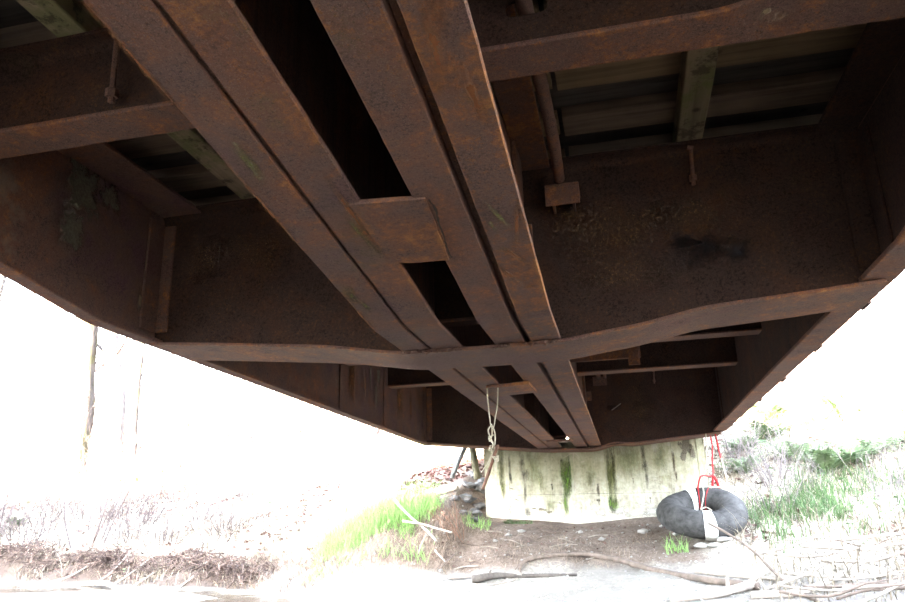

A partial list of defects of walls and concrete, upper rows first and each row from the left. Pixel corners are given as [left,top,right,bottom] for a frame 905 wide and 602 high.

corrosion [103,24,175,104]
leakage [498,455,534,498]
leakage [561,460,571,513]
leakage [607,458,617,512]